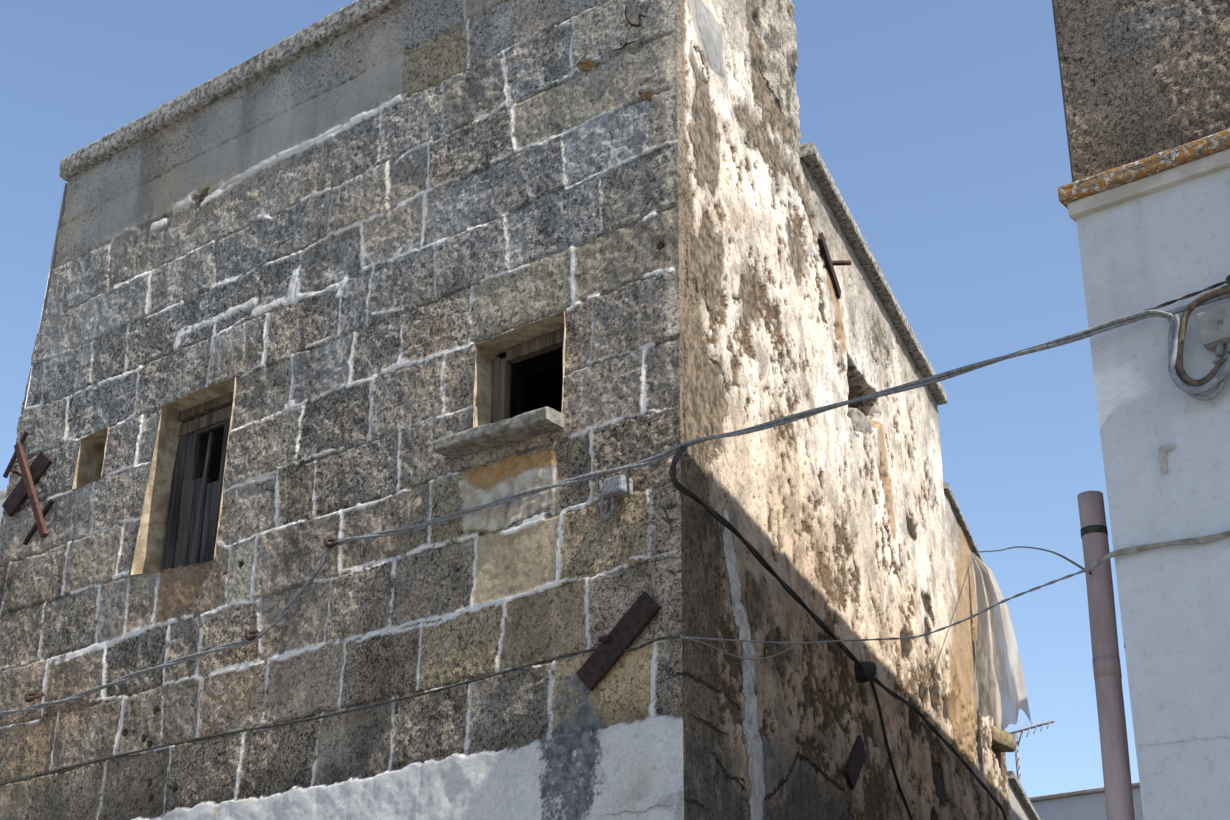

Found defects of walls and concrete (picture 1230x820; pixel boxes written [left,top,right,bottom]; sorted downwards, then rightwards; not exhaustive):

flaking render [684,41,761,329]
flaking render [733,0,817,286]
flaking render [680,314,728,618]
spalling [847,366,879,437]
water stain [539,671,605,820]